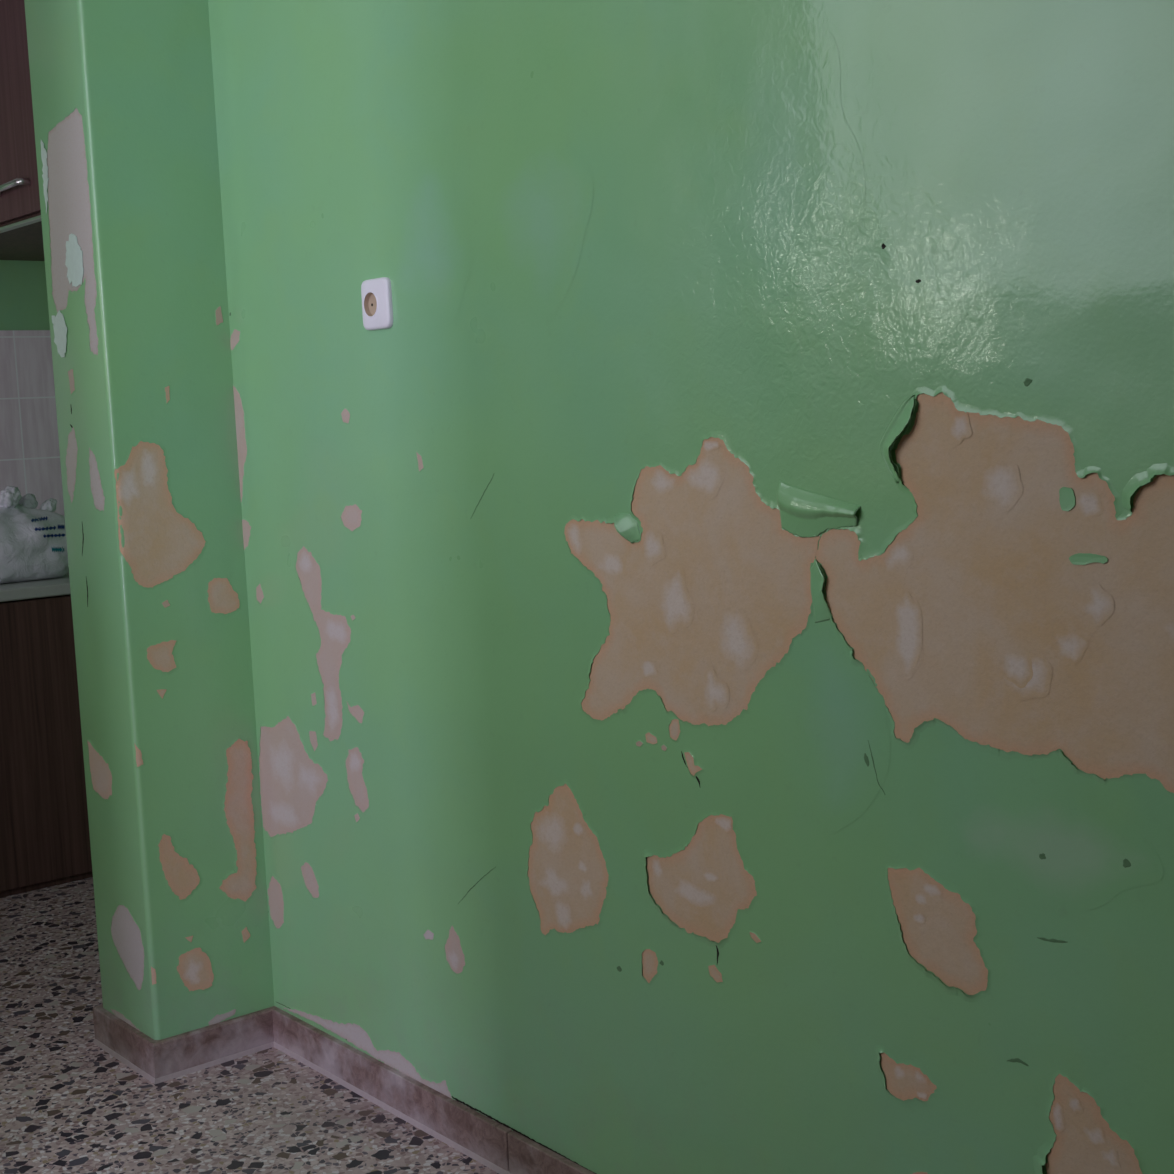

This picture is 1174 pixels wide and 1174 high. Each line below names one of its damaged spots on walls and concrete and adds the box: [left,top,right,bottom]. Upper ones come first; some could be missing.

peeling [40,104,100,396]
peeling [64,425,208,609]
peeling [562,386,1174,799]
peeling [154,543,371,931]
peeling [110,902,158,993]
peeling [172,934,217,995]
peeling [525,778,613,938]
peeling [642,810,763,985]
peeling [885,861,992,1003]
peeling [282,1005,453,1099]
peeling [874,1045,942,1109]
peeling [1033,1069,1148,1174]